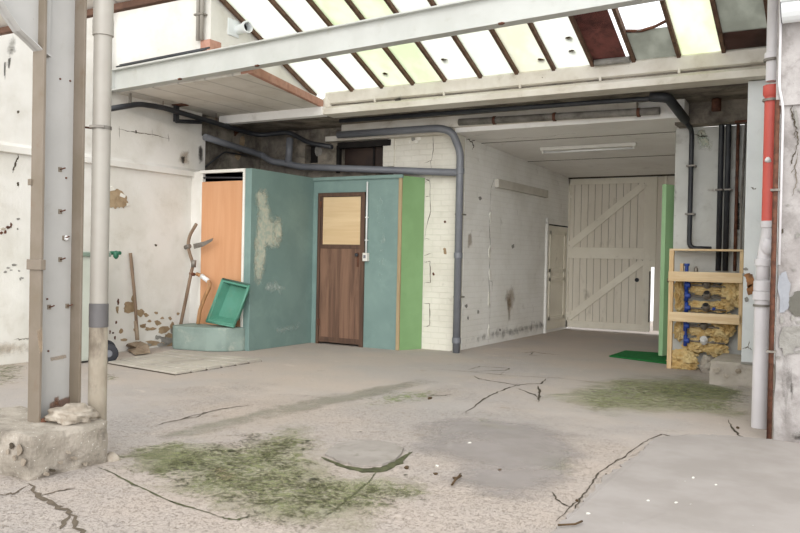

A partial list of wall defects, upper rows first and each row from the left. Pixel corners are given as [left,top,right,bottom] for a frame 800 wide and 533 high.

crack [790,106,799,194]
spalling [110,186,129,209]
peeling [255,190,281,279]
peeling [109,295,180,347]
spalling [777,269,800,324]
corrosion [50,397,70,408]
crack [159,404,254,425]
crack [430,366,618,411]
crack [0,483,86,533]
crack [99,467,249,520]
crack [552,434,687,521]